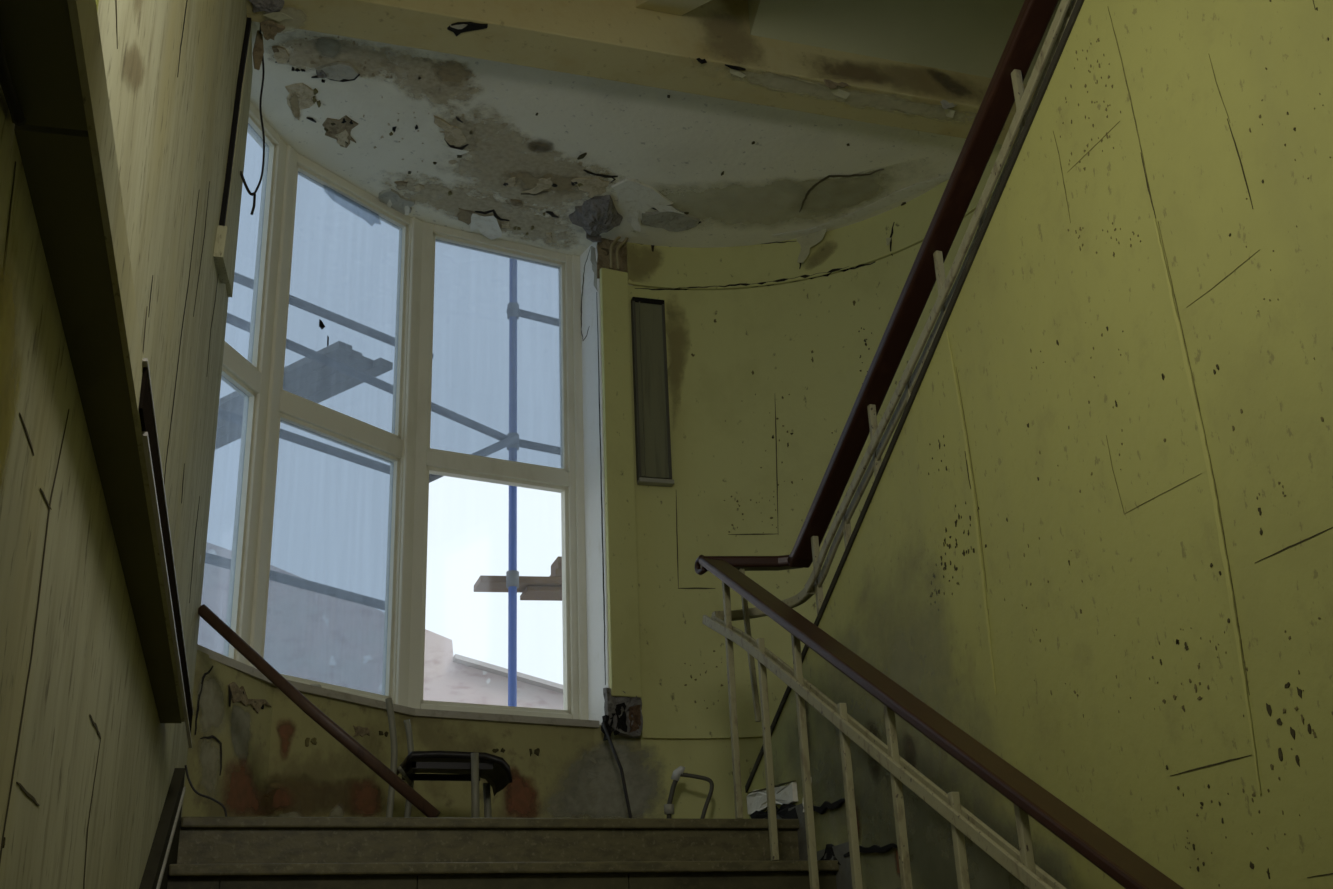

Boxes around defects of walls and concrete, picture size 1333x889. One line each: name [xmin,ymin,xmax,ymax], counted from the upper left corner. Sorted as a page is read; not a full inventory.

spalling [447,22,488,37]
peeling [249,0,452,148]
peeling [374,112,478,215]
peeling [448,153,701,240]
crack [764,169,884,244]
spalling [590,238,627,295]
crack [635,222,895,290]
crack [1053,6,1333,794]